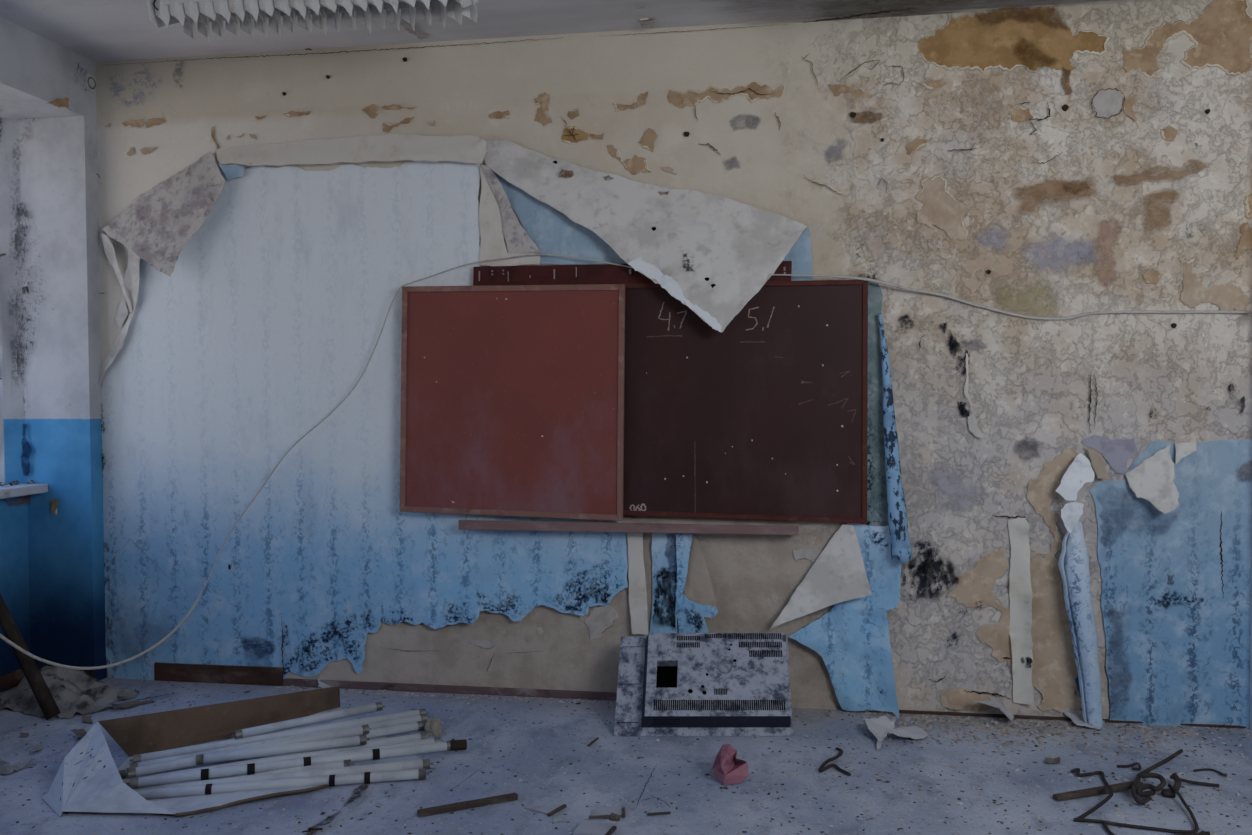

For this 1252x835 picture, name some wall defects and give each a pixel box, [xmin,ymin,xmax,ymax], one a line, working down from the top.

water stain [750,0,1068,29]
water stain [1017,40,1072,95]
peeling [917,0,1252,89]
peeling [127,147,157,156]
peeling [533,91,677,175]
crack [1016,102,1061,164]
mould [9,201,40,377]
crack [1088,373,1098,430]
mould [901,541,959,598]
peeling [1027,447,1105,729]
water stain [241,611,413,675]